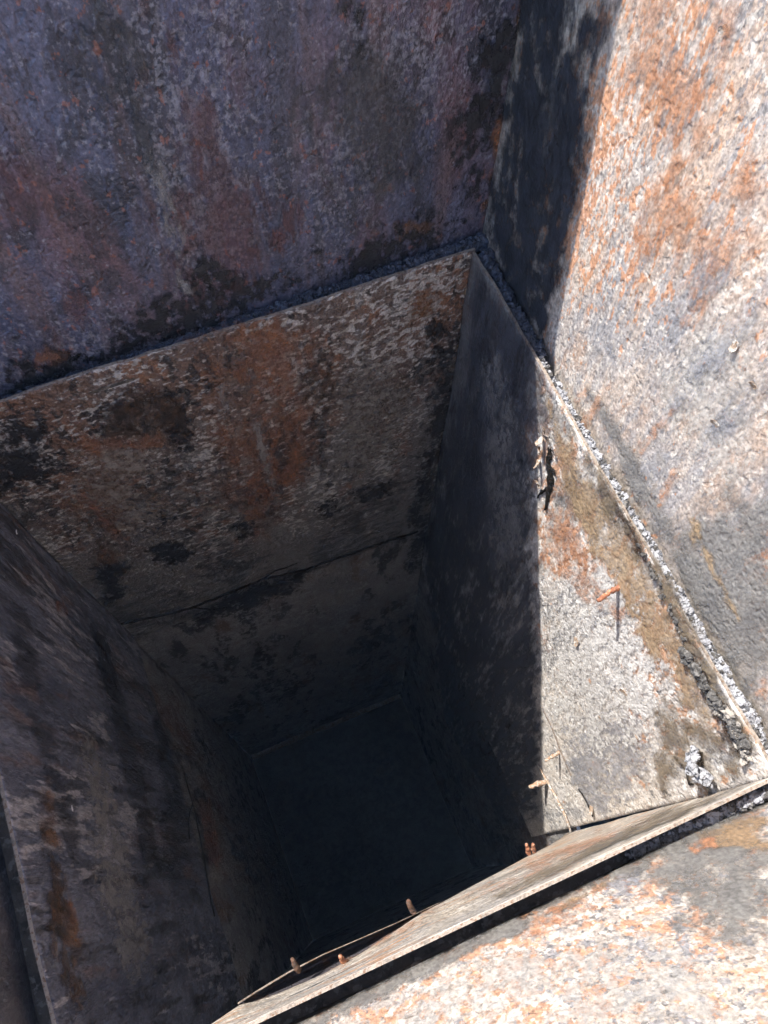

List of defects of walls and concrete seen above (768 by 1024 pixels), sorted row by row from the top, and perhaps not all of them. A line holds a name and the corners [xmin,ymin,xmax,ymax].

water stain [182,250,233,299]
crack [121,530,418,625]
rust [555,430,719,739]
rust [690,817,768,853]